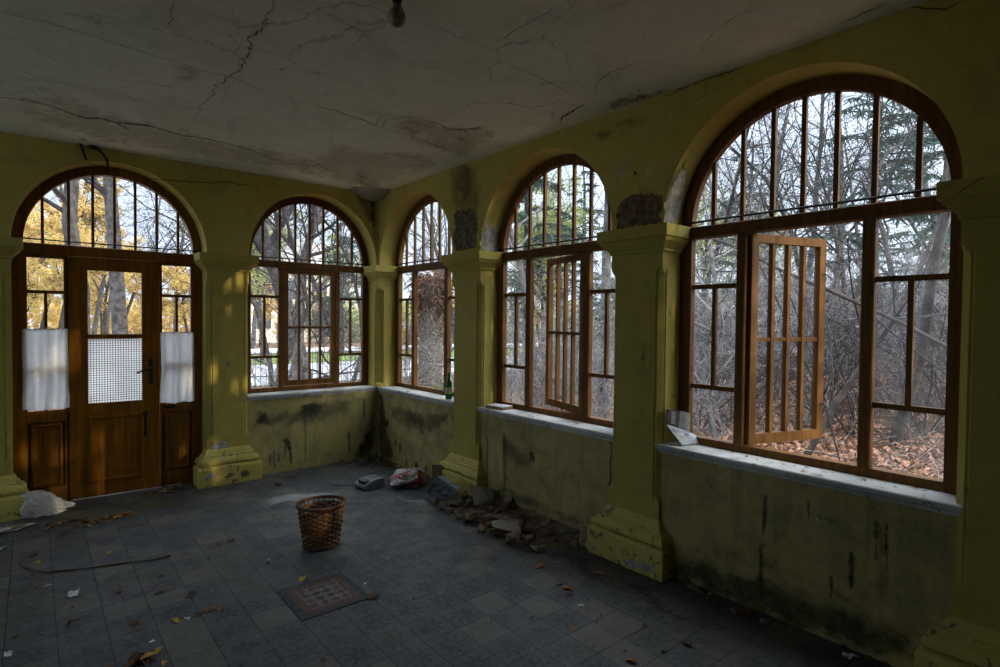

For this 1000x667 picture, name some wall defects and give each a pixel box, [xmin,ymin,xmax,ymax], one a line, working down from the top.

crack [0,1,660,187]
spalling [453,205,500,252]
spalling [613,161,689,229]
damp [257,402,347,458]
damp [348,395,442,458]
damp [676,551,910,653]